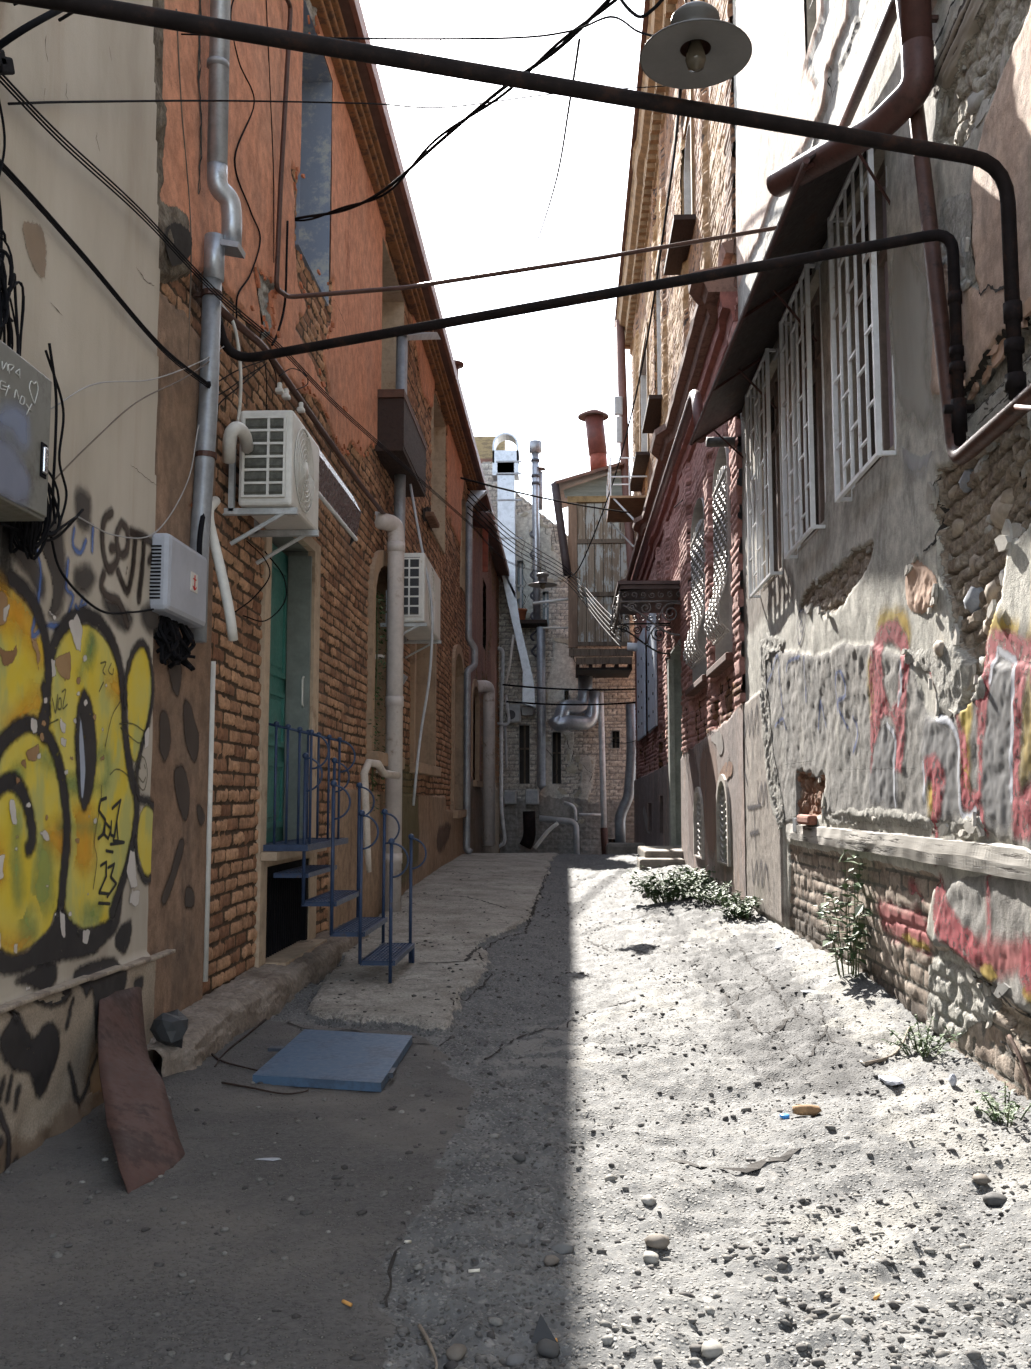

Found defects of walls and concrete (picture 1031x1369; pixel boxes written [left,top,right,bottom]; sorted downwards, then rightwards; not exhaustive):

flaking render [935,0,1031,147]
flaking render [938,192,976,291]
peeling [963,297,1031,438]
flaking render [800,543,873,619]
flaking render [901,415,1031,718]
flaking render [759,633,985,837]
crack [712,943,845,1062]